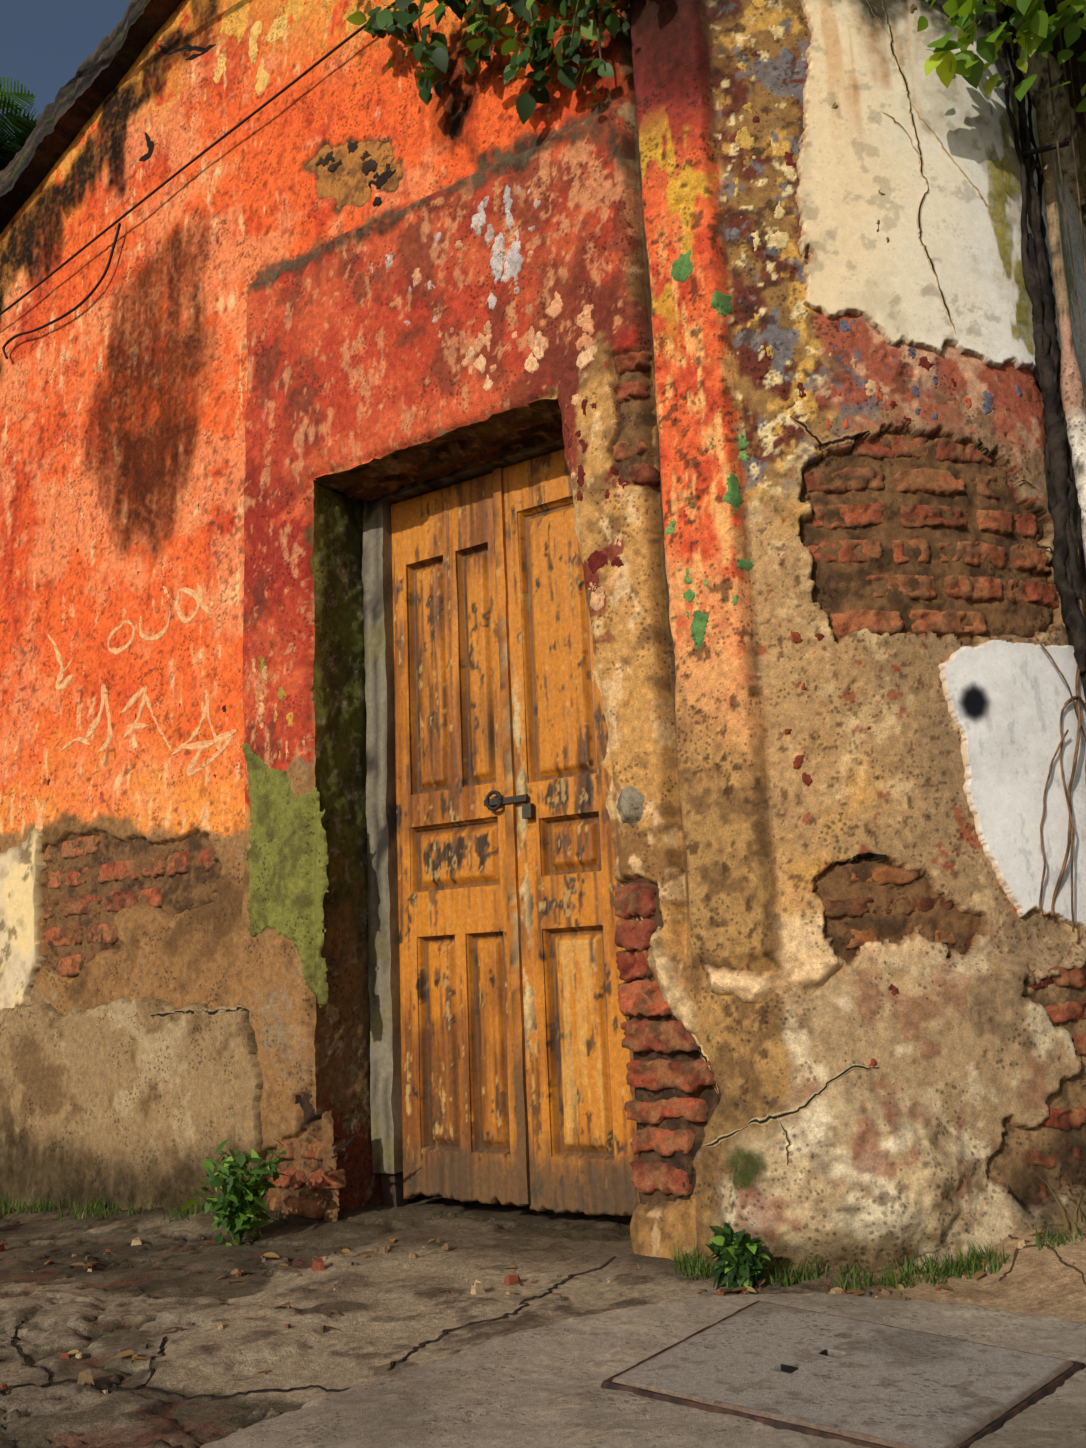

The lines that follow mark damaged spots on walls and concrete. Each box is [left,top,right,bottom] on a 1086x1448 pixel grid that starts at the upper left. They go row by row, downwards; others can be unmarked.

water stain [0,0,217,312]
water stain [85,229,207,552]
peeling [434,185,595,391]
peeling [729,0,1086,932]
crack [867,1,996,335]
spalling [0,828,222,1011]
peeling [242,655,329,1008]
spalling [614,878,721,1206]
crack [673,1014,719,1094]
crack [703,1064,879,1165]
crack [0,1319,351,1400]
crack [388,1256,616,1370]